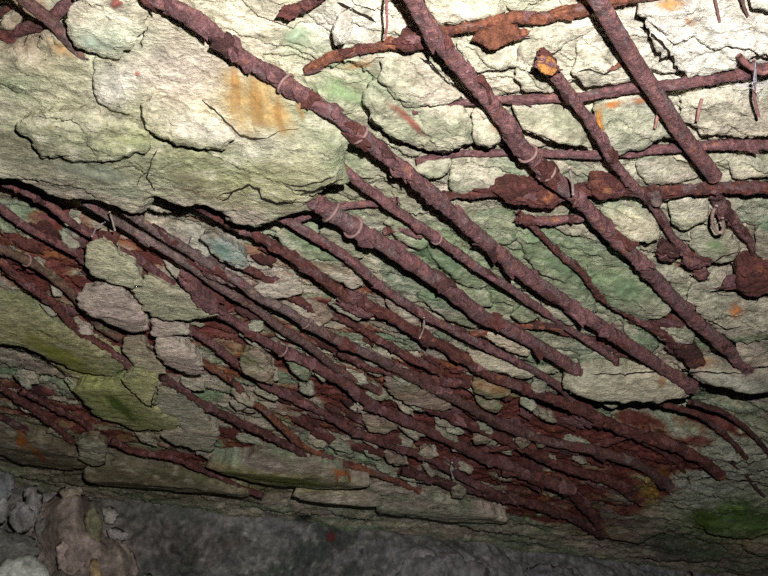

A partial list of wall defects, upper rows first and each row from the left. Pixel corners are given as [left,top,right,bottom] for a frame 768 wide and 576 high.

rust [0,178,99,240]
rust [0,243,133,370]
crack [137,150,157,190]
crack [202,100,299,140]
peeling [0,209,557,524]
crack [219,176,344,205]
rust [158,325,608,539]
rust [81,0,768,506]
peeling [363,49,699,352]
peeling [562,350,689,409]
peeling [668,195,741,264]
peeling [666,276,768,394]